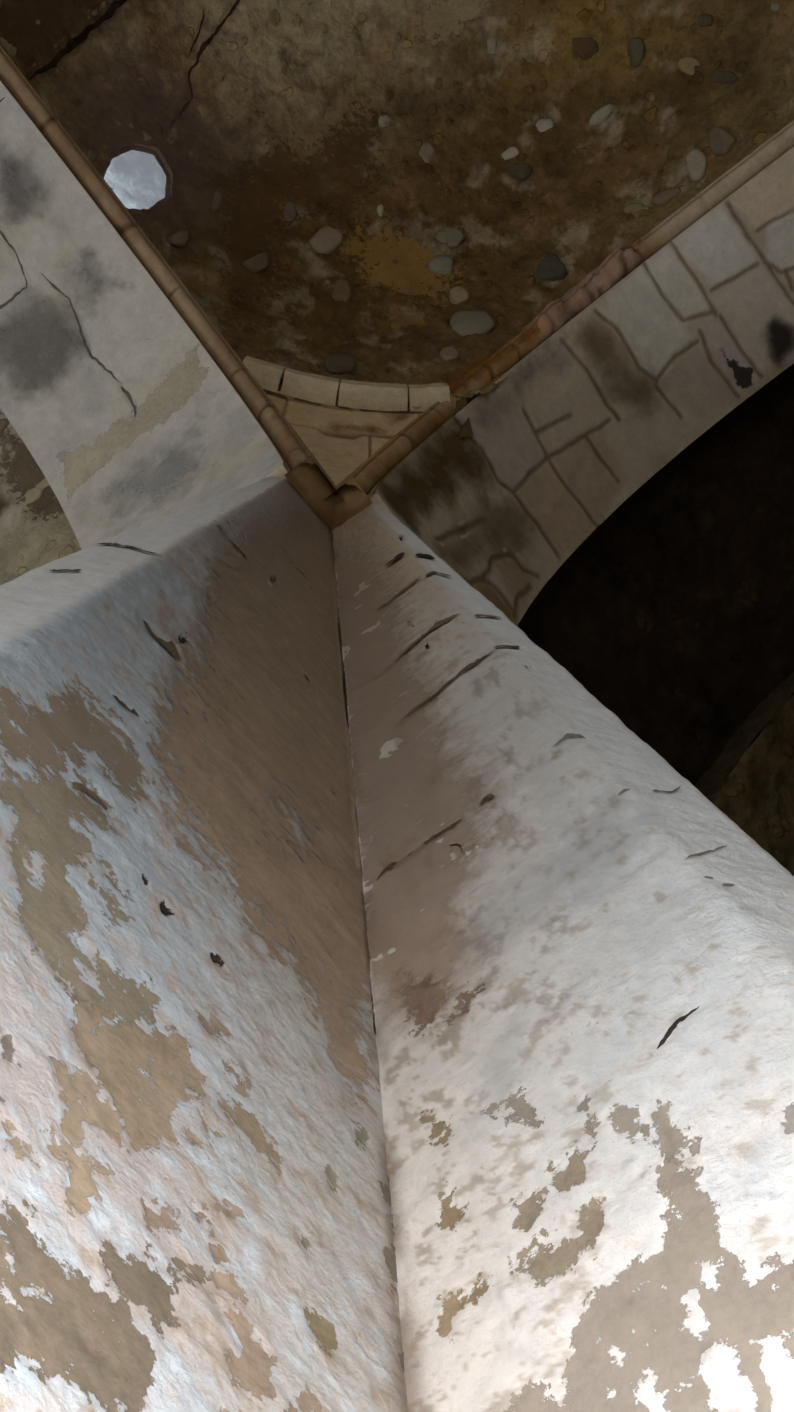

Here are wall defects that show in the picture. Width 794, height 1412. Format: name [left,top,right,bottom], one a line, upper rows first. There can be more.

crack [0,0,127,102]
crack [172,0,240,126]
damp [1,160,36,209]
damp [0,305,83,388]
crack [0,230,137,420]
damp [379,421,487,531]
flaking render [0,675,289,1217]
flaking render [0,1185,321,1412]
flaking render [304,1306,338,1359]
flaking render [435,1180,469,1232]
flaking render [436,1272,493,1340]
flaking render [503,1095,794,1412]